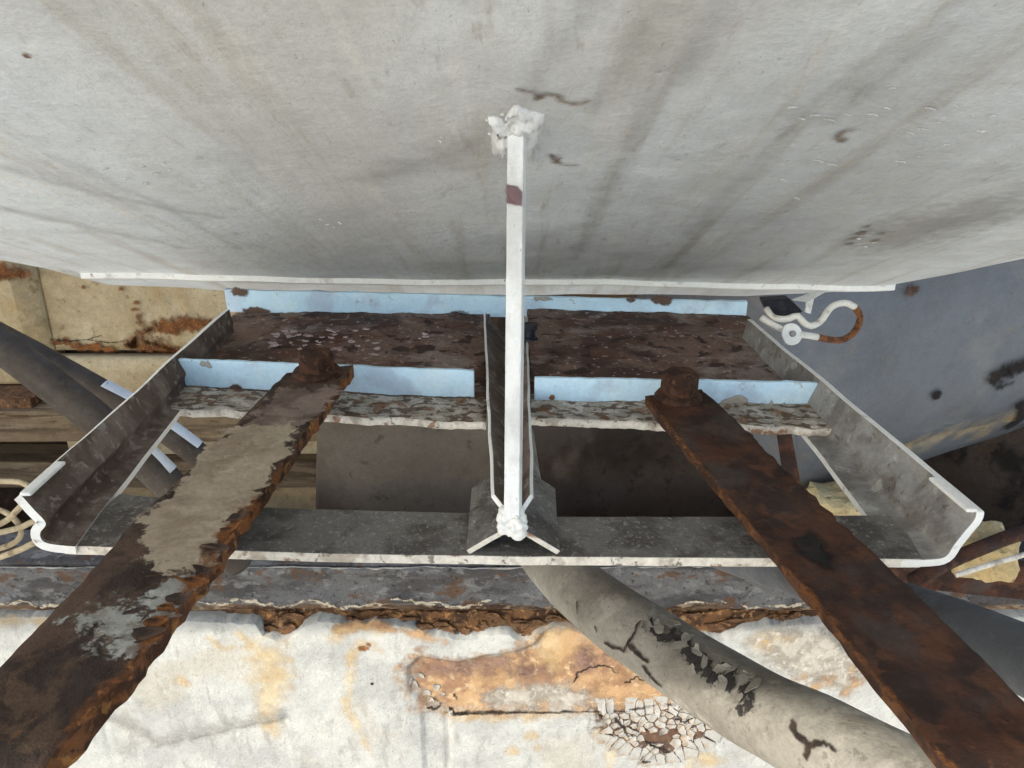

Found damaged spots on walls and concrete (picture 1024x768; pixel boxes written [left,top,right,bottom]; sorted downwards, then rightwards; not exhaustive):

corrosion [50,301,212,354]
corrosion [0,347,354,768]
corrosion [645,366,1024,768]
corrosion [335,620,680,717]
crack [576,601,661,687]